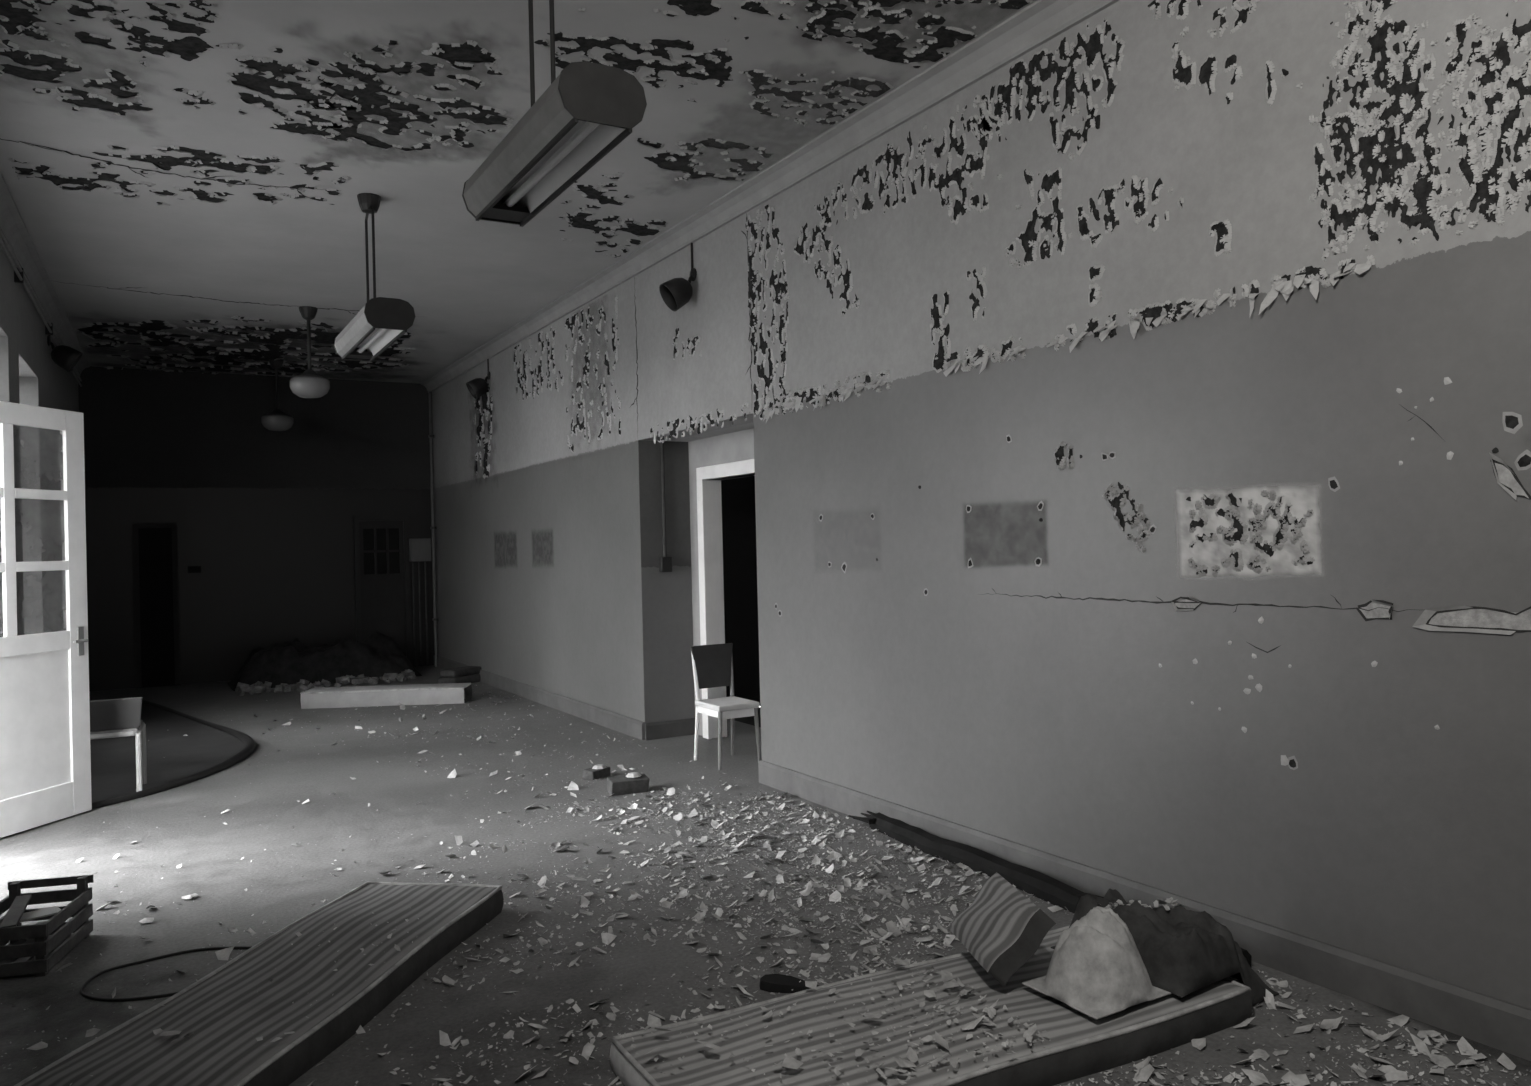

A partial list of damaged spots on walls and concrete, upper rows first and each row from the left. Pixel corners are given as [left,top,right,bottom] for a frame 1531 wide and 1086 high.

peeling [0,0,513,152]
peeling [534,31,894,126]
peeling [8,145,352,206]
peeling [637,0,1531,443]
peeling [73,315,417,376]
peeling [513,295,622,453]
peeling [473,374,493,479]
peeling [1102,482,1157,553]
peeling [1186,489,1315,578]
spalling [1489,447,1531,500]
spalling [1172,597,1203,611]
crack [979,589,1413,653]